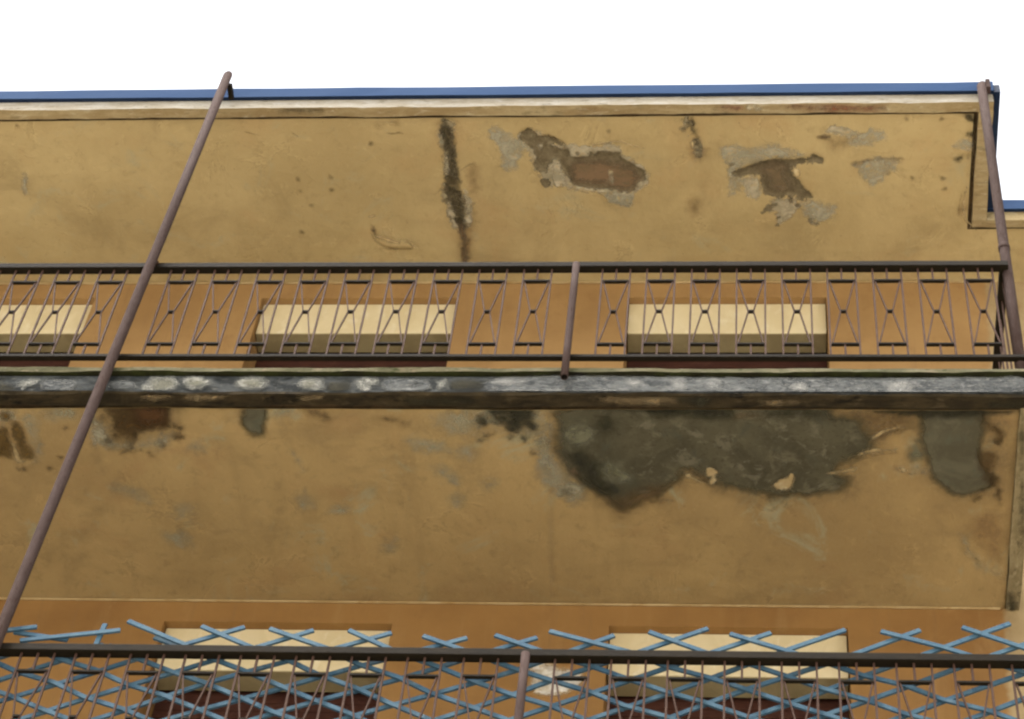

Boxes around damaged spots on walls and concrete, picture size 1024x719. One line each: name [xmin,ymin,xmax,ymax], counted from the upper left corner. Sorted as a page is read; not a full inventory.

crack [680,116,702,157]
crack [439,118,473,262]
flaking render [488,127,650,207]
flaking render [721,144,836,226]
leakage [0,379,38,390]
leakage [142,377,208,390]
leakage [237,378,266,388]
leakage [299,378,377,391]
leakage [241,409,267,436]
leakage [407,380,1015,510]